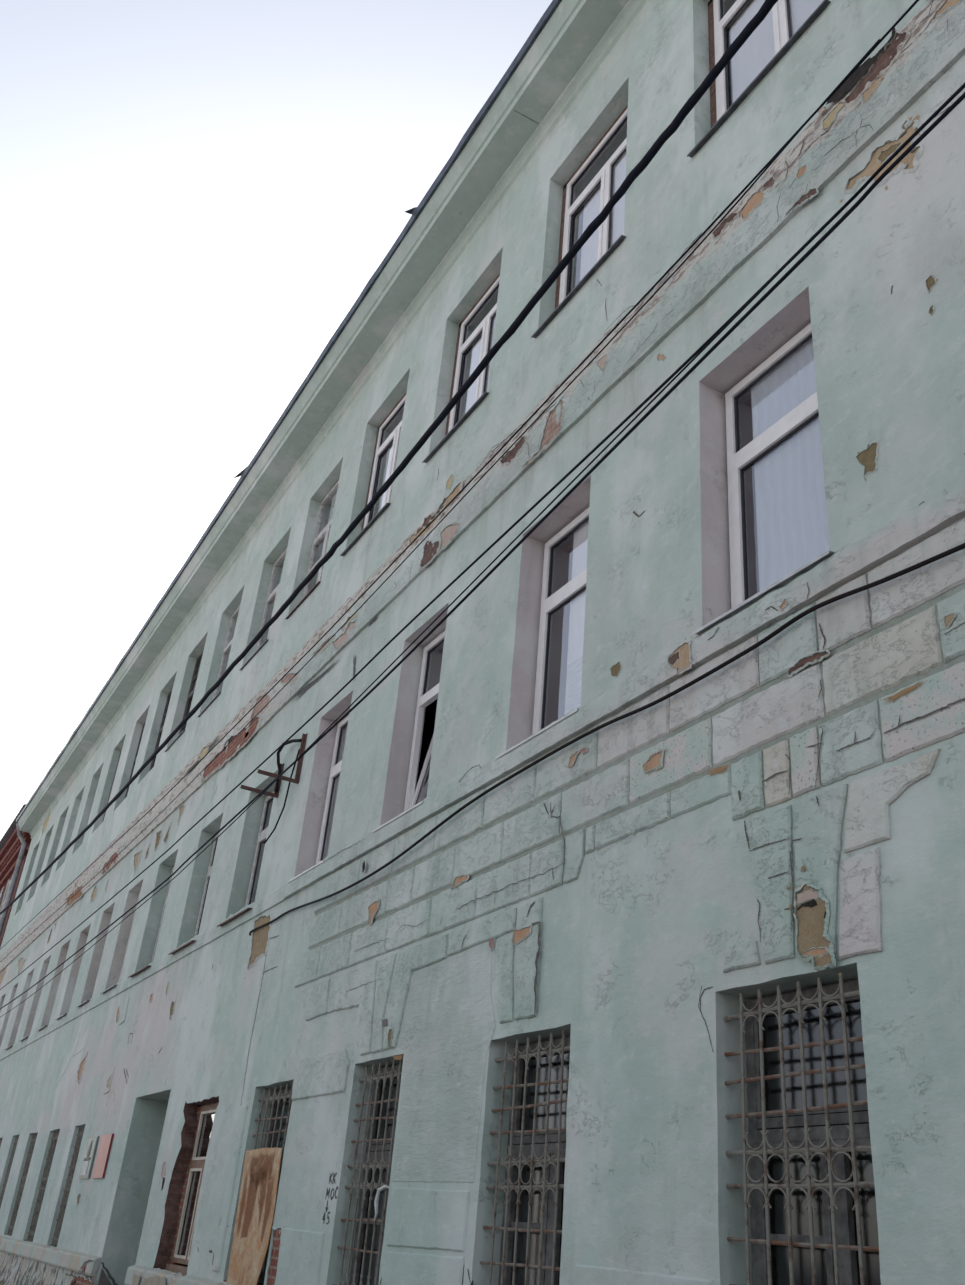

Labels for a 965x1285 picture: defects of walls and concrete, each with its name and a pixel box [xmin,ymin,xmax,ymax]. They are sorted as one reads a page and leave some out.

peeling [840,115,924,203]
spalling [500,397,565,468]
peeling [855,441,879,481]
spalling [405,474,464,570]
peeling [668,637,692,675]
spalling [787,648,830,678]
crack [807,582,826,697]
spalling [198,671,299,782]
peeling [642,749,667,773]
crack [738,698,965,943]
peeling [245,912,272,978]
peeling [787,865,841,976]